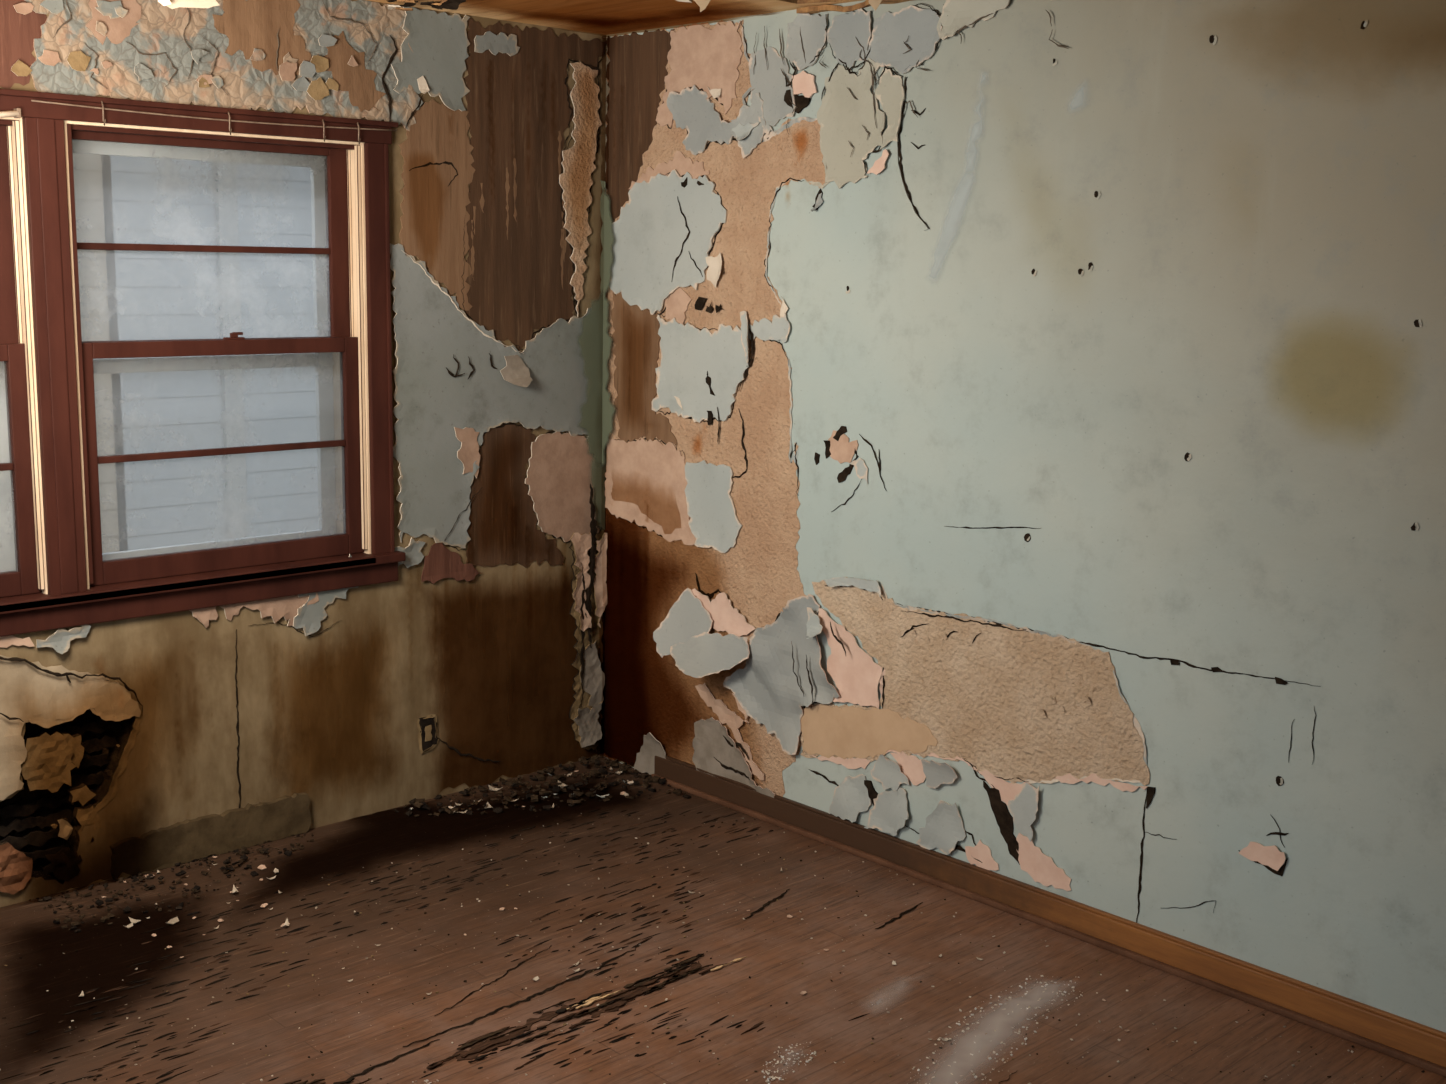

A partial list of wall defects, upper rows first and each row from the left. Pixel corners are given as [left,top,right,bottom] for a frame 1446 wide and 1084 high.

peeling [382,0,1156,891]
crack [0,656,143,712]
crack [897,603,1321,764]
spalling [0,706,161,898]
crack [1136,792,1216,923]
spalling [1238,814,1289,876]